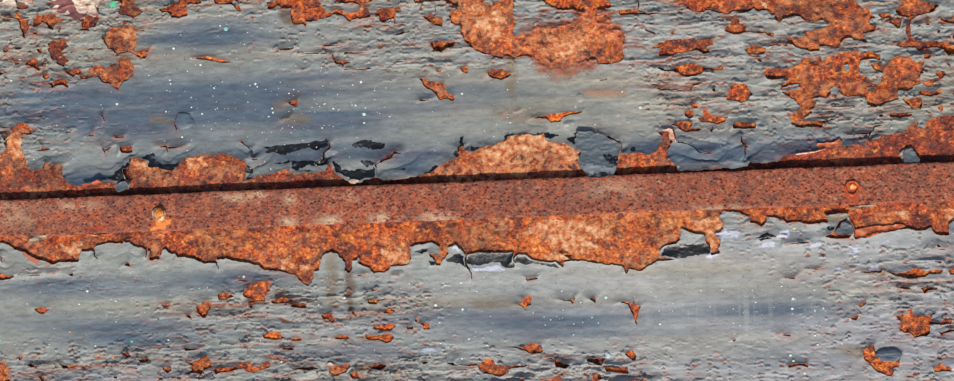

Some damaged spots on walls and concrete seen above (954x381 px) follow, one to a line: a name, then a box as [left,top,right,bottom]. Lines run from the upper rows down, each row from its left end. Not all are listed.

corrosion [19,14,69,88]
corrosion [79,0,149,90]
corrosion [414,0,659,80]
corrosion [650,38,723,77]
corrosion [678,0,954,128]
corrosion [0,122,588,200]
peeling [574,131,622,178]
corrosion [613,110,954,175]
corrosion [0,193,954,307]
corrosion [447,344,543,377]
corrosion [863,345,900,376]
corrosion [896,309,952,338]